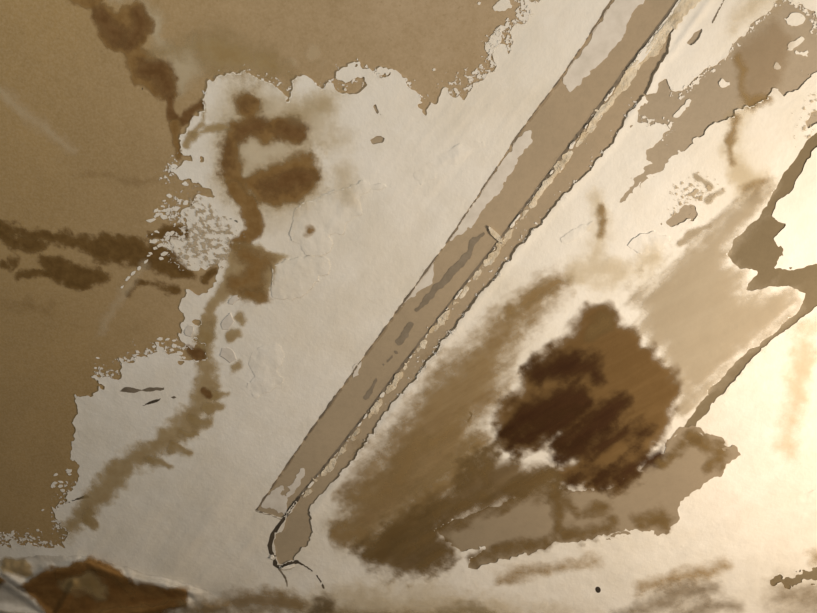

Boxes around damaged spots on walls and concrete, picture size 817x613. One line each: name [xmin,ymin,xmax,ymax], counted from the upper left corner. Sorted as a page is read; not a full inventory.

water stain [0,0,319,534]
peeling [0,0,540,549]
crack [255,0,678,589]
water stain [330,278,726,576]
water stain [499,566,566,584]
peeling [258,0,817,569]
peeling [770,567,817,590]